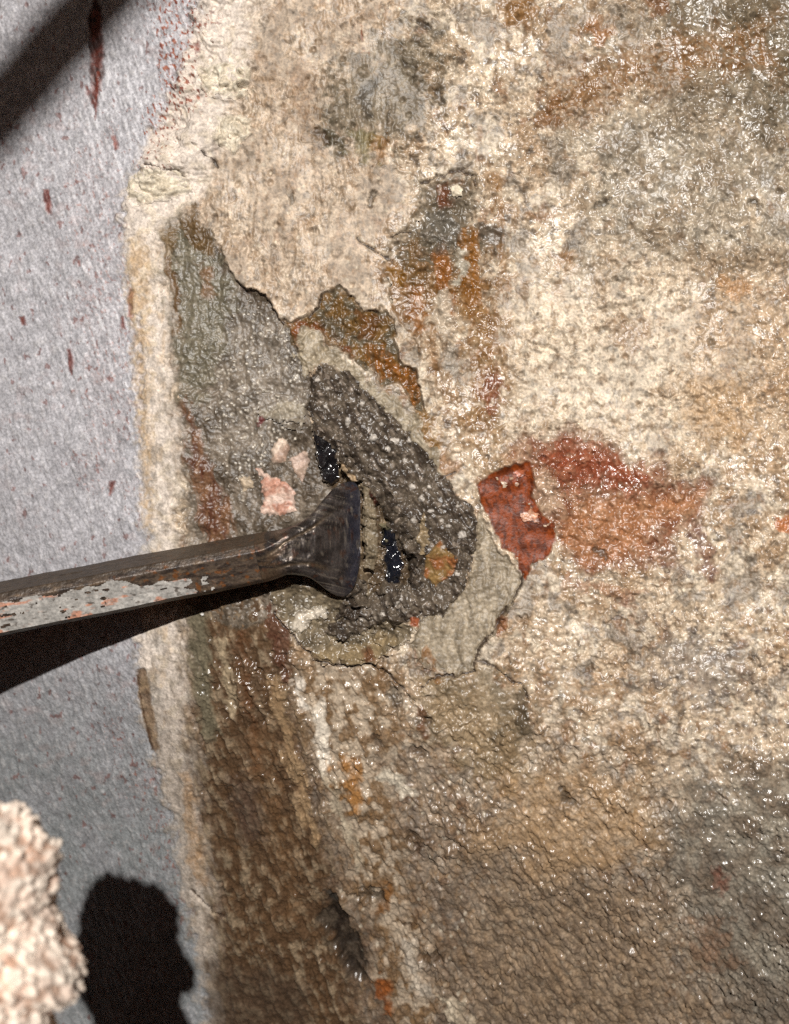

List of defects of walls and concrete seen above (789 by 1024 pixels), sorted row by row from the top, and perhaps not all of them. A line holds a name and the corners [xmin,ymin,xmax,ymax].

spalling [0,460,558,685]
spalling [126,155,518,548]
rust [411,279,527,482]
leakage [166,417,789,1024]